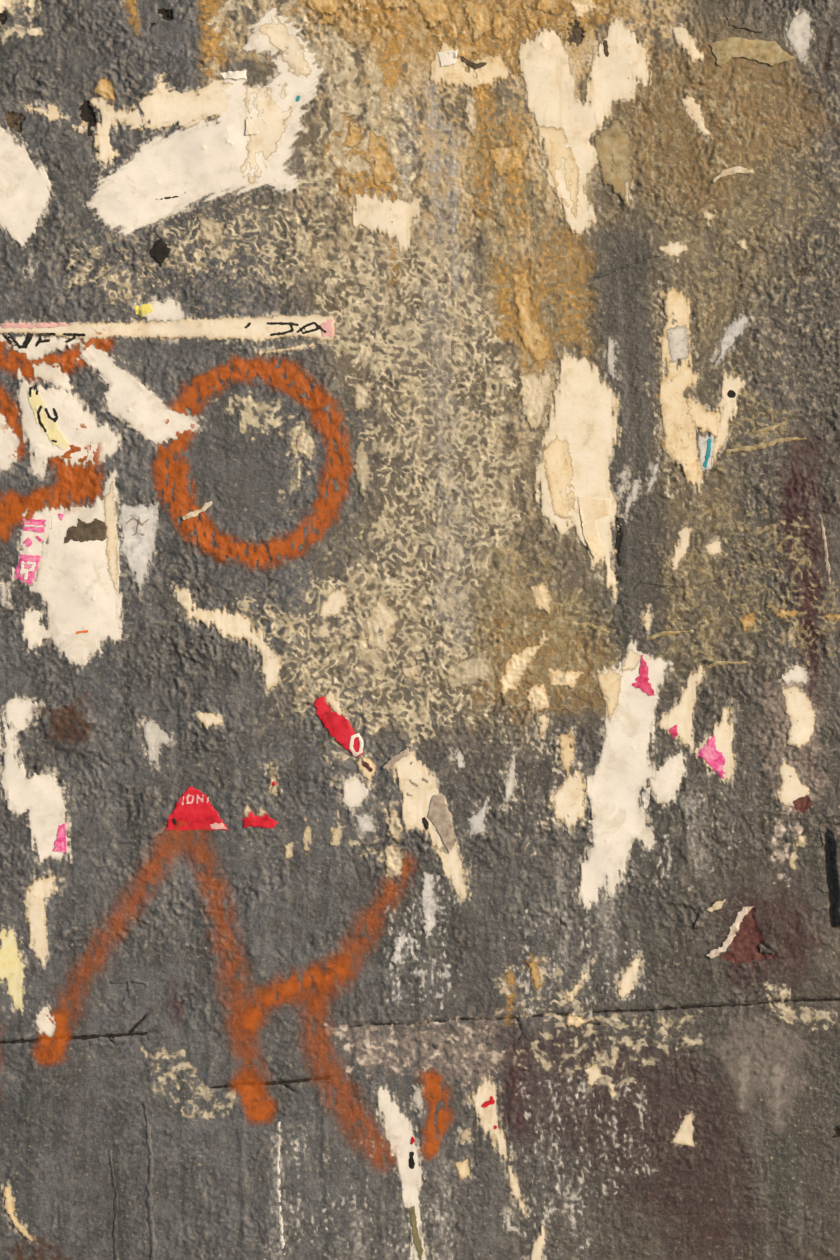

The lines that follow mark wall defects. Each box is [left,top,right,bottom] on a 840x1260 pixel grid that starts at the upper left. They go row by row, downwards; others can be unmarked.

crack [0,1013,147,1044]